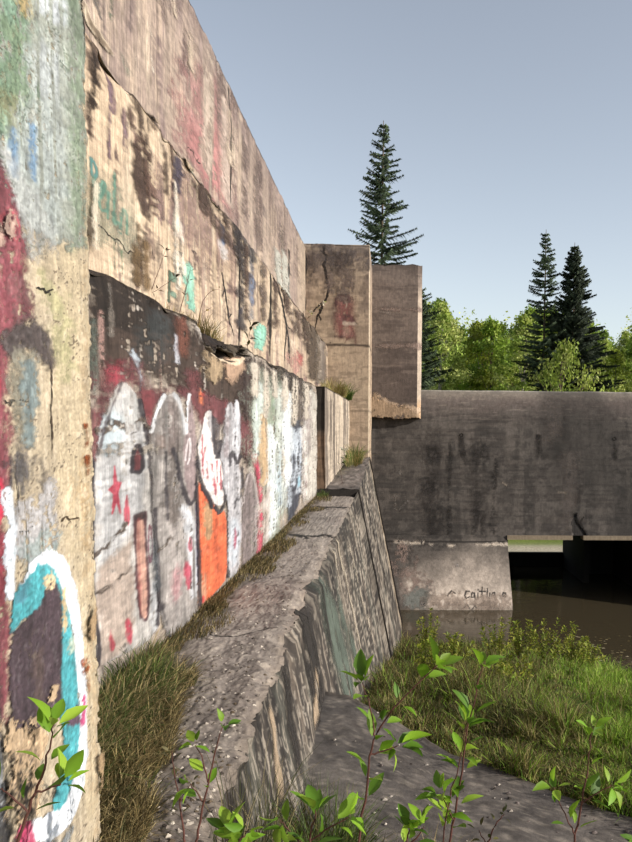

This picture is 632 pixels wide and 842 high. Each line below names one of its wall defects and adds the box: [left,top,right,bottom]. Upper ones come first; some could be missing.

spalling [201,333,246,384]
crack [221,260,245,362]
crack [267,245,330,364]
spalling [371,393,421,419]
peeling [48,684,59,703]
peeling [0,716,50,828]